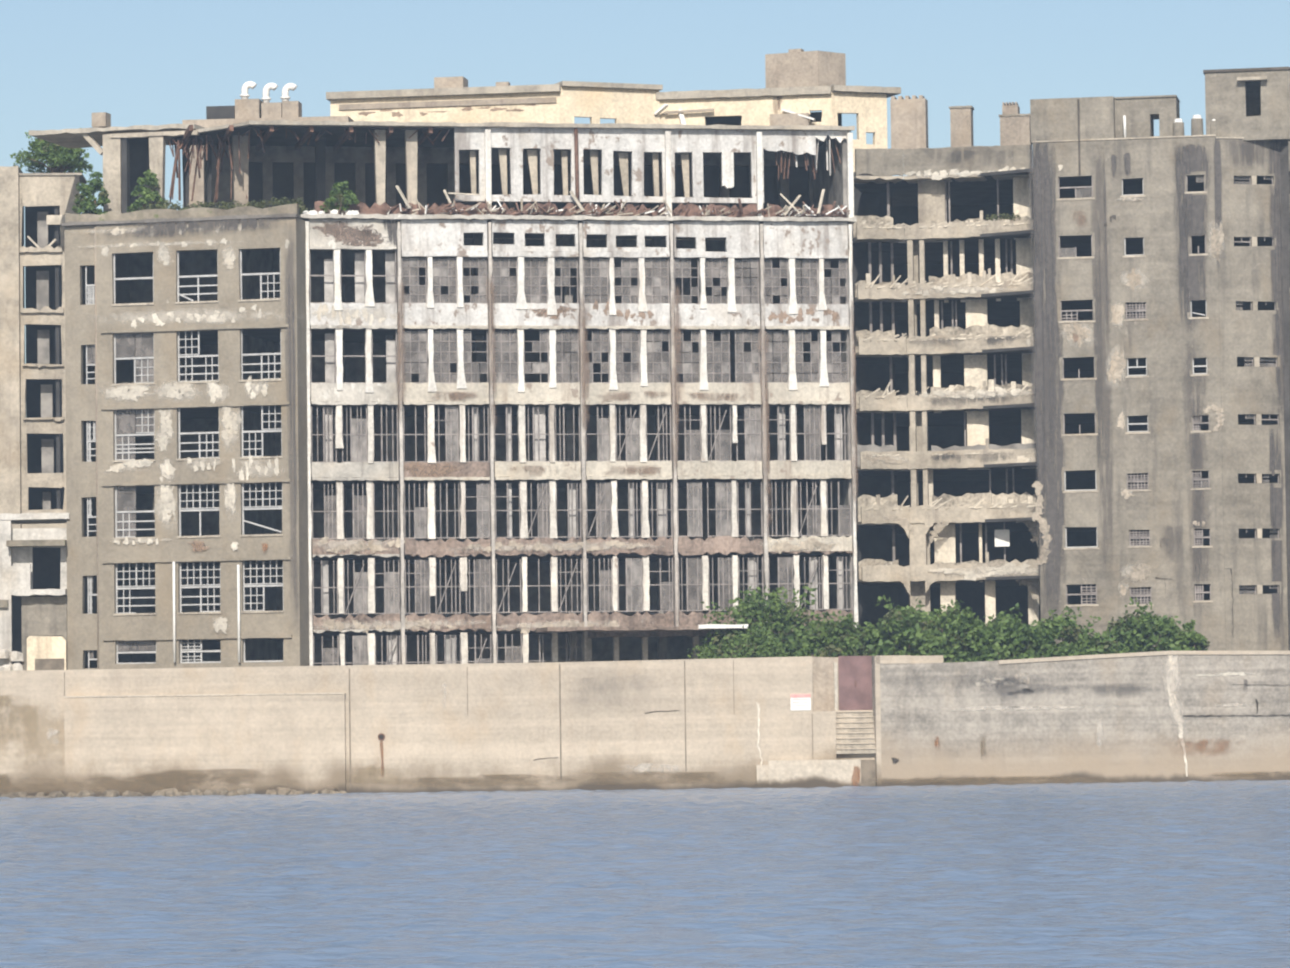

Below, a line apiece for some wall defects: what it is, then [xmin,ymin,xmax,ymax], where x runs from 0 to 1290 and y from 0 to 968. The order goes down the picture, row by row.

peeling [106,377,280,523]
spalling [1203,404,1225,432]
peeling [113,537,158,545]
spalling [929,481,1052,600]
crack [1168,655,1290,776]